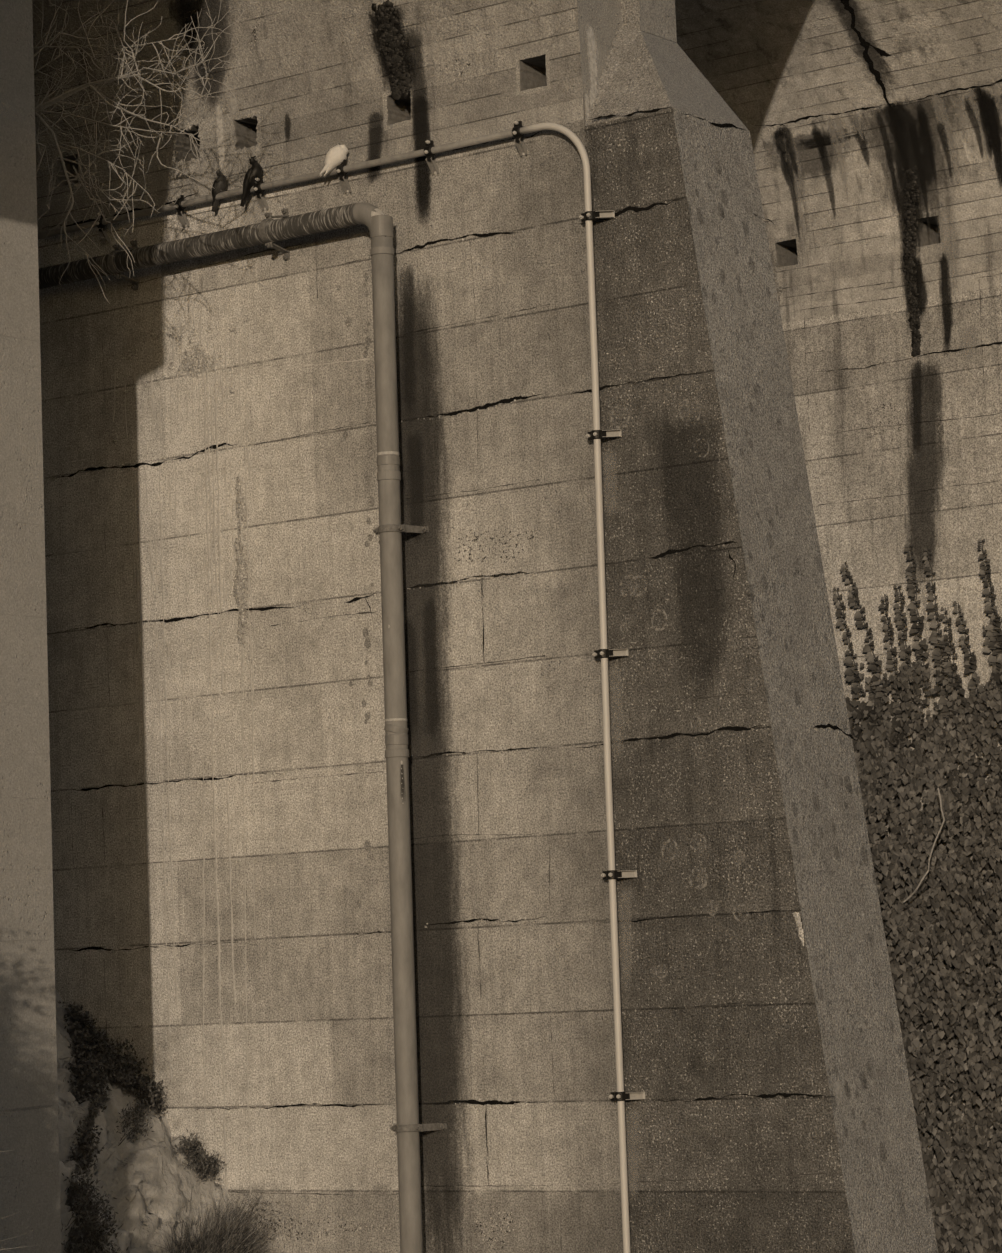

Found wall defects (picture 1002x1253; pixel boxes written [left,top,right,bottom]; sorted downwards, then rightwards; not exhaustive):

damp [963,88,1002,183]
damp [774,116,869,229]
crack [396,230,524,254]
damp [878,104,952,350]
crack [401,372,707,422]
crack [51,443,242,481]
damp [112,305,256,1193]
crack [579,724,765,750]
crack [814,723,859,742]
crack [65,771,287,791]